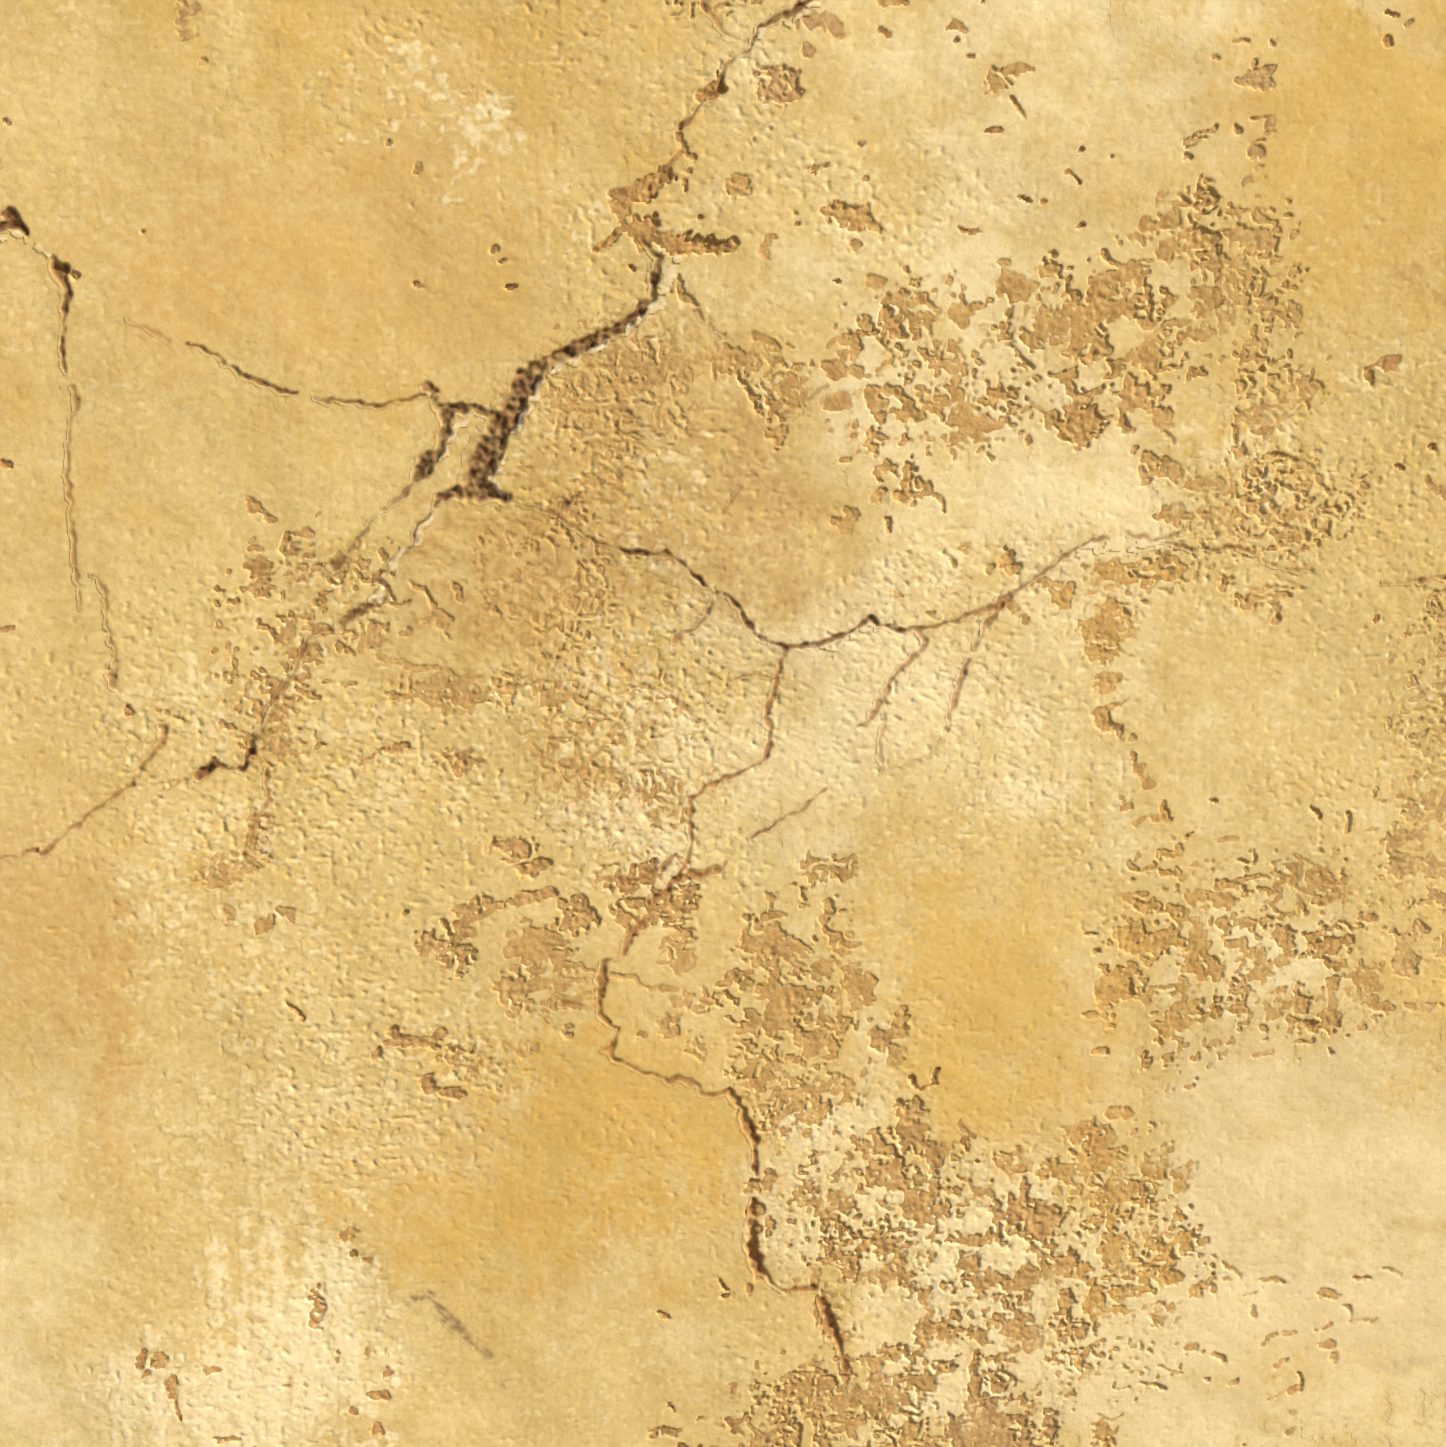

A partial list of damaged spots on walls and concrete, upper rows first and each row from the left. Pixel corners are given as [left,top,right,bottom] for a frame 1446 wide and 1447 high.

flaking render [175,0,201,42]
flaking render [875,0,910,8]
flaking render [945,18,975,59]
flaking render [695,70,726,102]
crack [676,0,825,132]
flaking render [1233,58,1277,91]
crack [1381,574,1446,587]
crack [0,204,1315,1374]
flaking render [211,115,1446,1447]
flaking render [135,1349,182,1421]
flaking render [202,1366,222,1375]